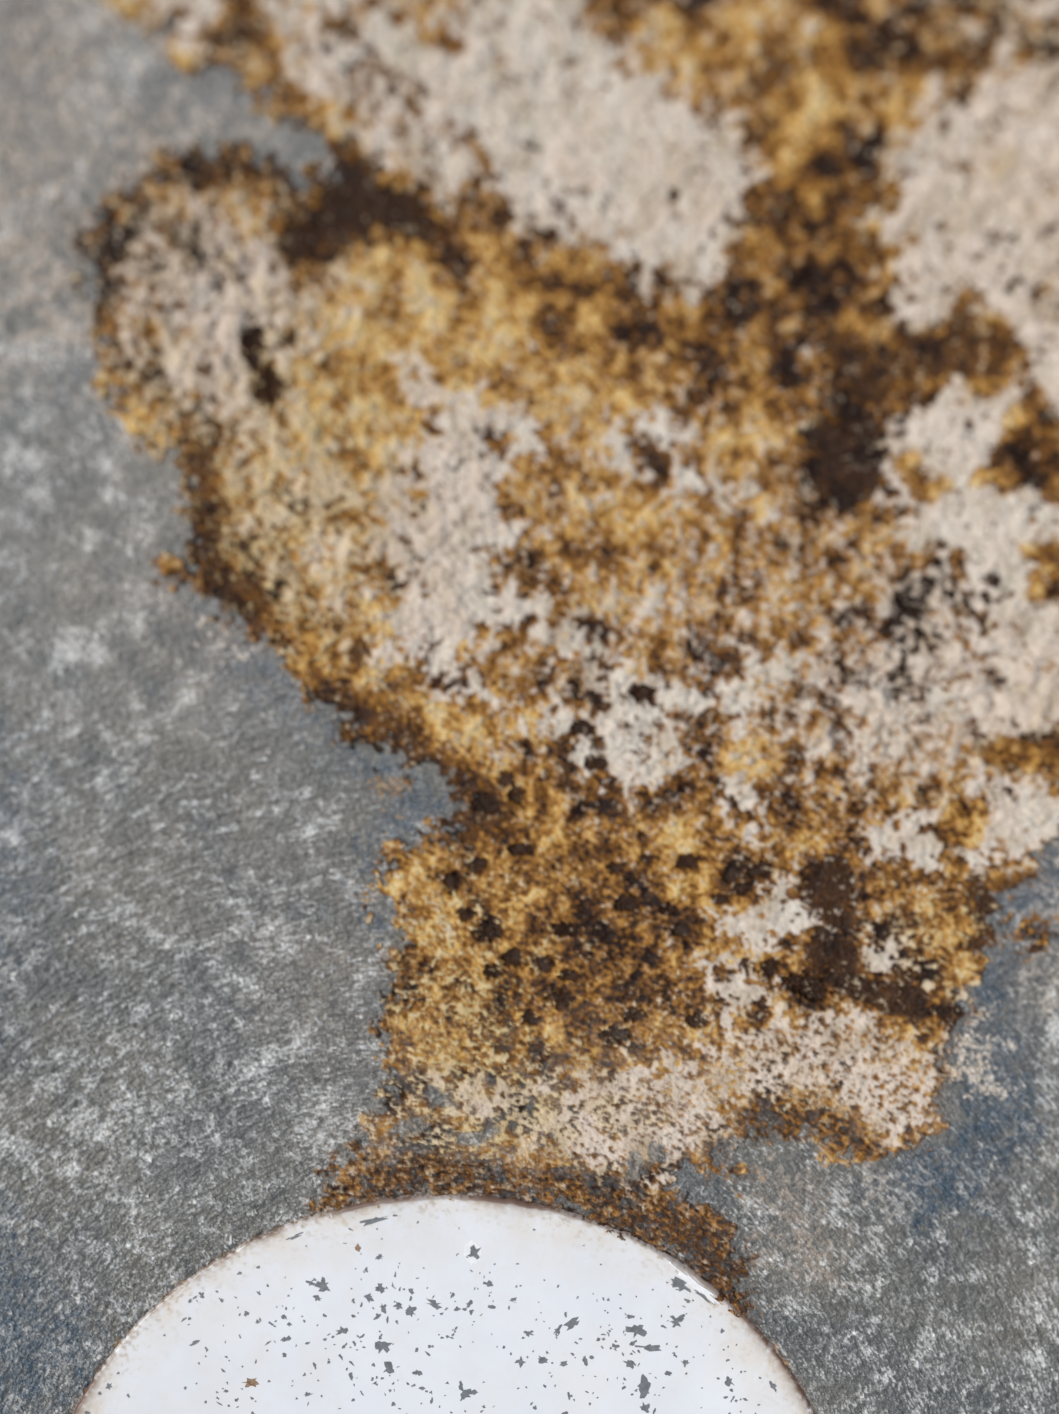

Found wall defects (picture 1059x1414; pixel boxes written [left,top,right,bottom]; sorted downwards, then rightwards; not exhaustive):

corrosion [71,0,1059,1204]
water stain [191,635,455,972]
corrosion [304,1142,522,1216]
corrosion [512,1147,763,1321]